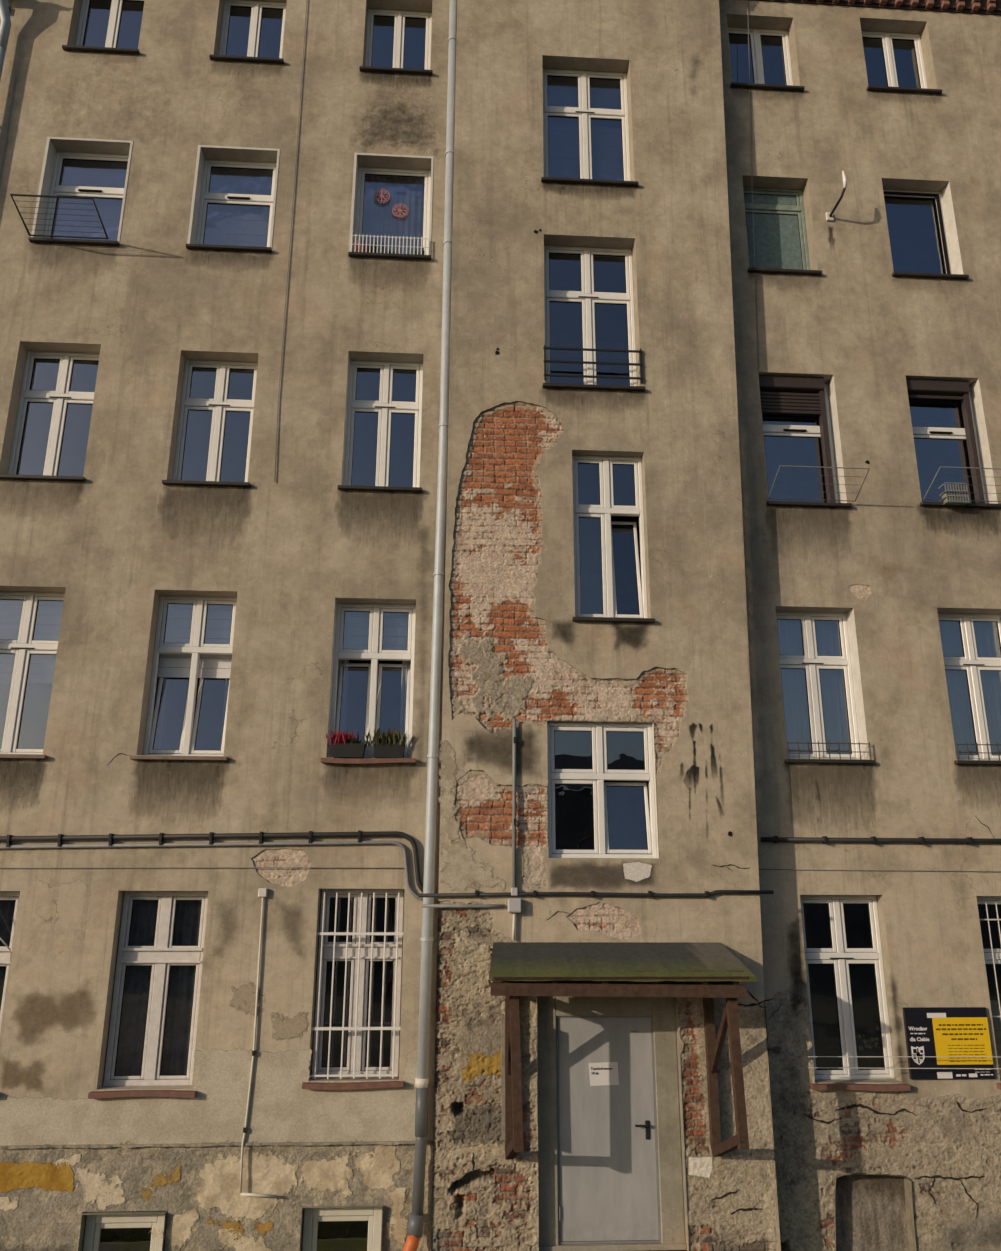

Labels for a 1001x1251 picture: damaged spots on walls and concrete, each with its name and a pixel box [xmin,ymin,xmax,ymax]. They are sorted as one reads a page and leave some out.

spalling [448,402,688,774]
leakage [680,723,723,816]
spalling [438,740,548,891]
spalling [251,848,311,888]
spalling [566,902,642,941]
leakage [18,991,90,1040]
leakage [3,1063,41,1088]
crack [804,1104,916,1124]
crack [956,1101,987,1113]
peeling [0,1154,125,1212]
peeling [151,1145,408,1251]
crack [915,1175,985,1220]